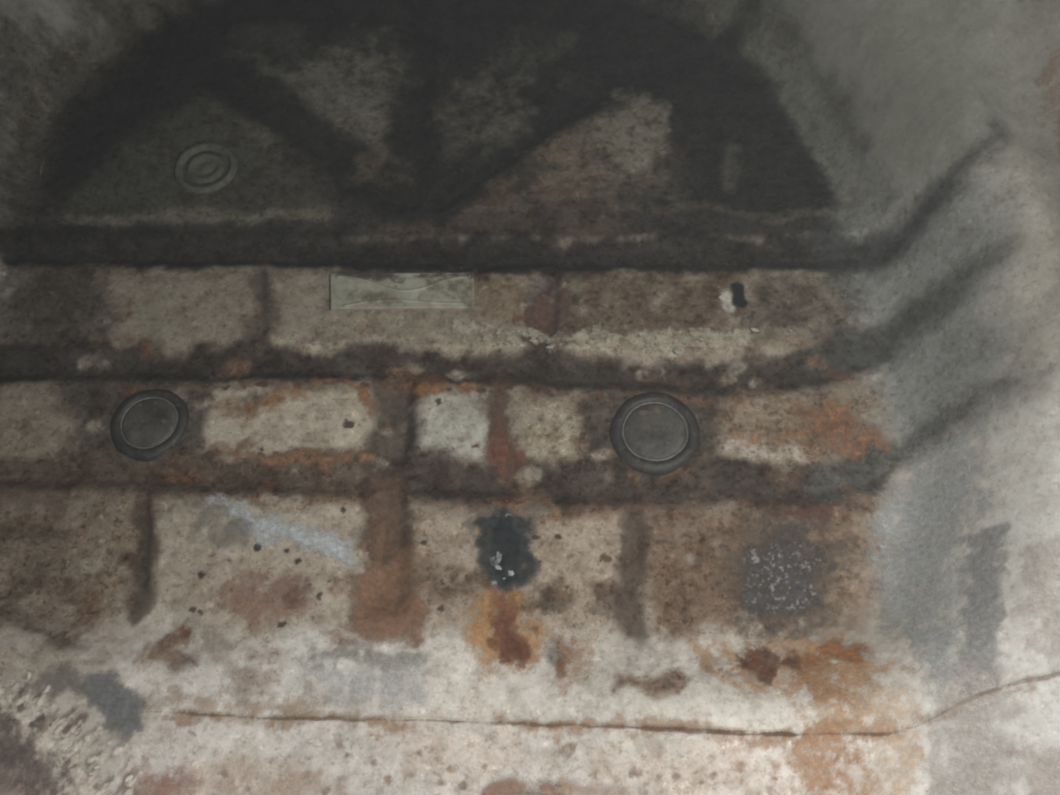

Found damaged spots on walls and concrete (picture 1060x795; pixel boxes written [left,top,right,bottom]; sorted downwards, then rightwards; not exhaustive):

corrosion [208,446,375,471]
corrosion [347,474,428,648]
corrosion [465,579,545,671]
crack [147,711,805,737]
crack [850,672,1060,737]